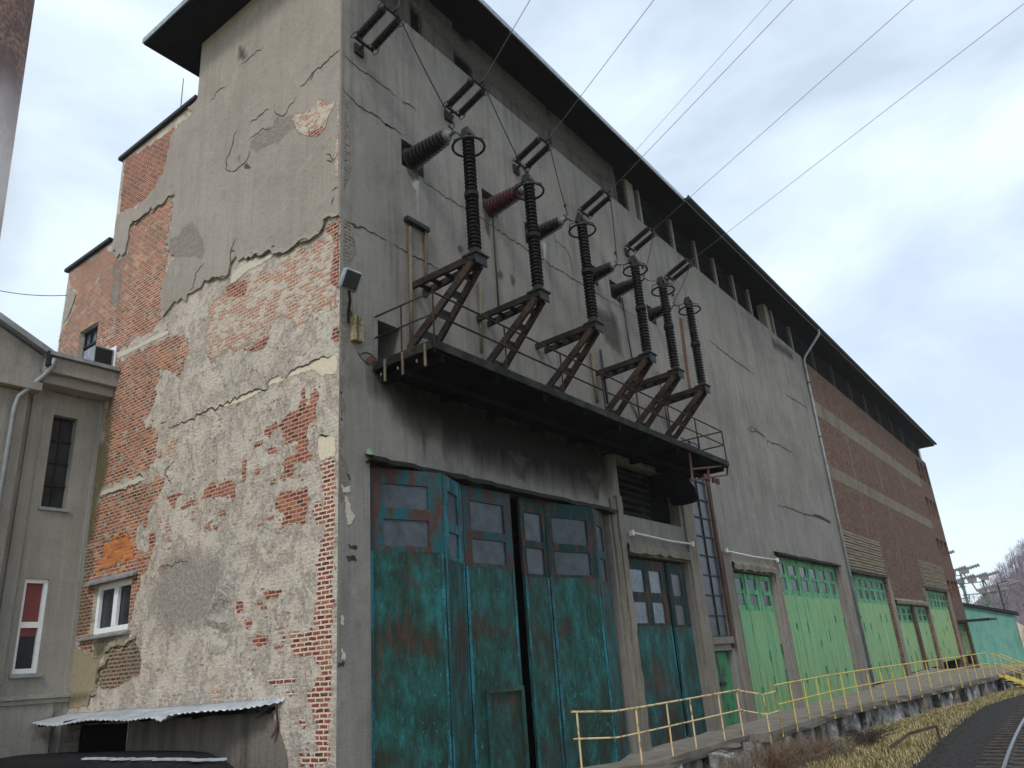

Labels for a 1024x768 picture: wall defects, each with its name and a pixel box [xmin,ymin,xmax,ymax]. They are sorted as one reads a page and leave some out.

crack [226,50,416,172]
spalling [292,97,351,189]
crack [189,241,235,291]
spalling [204,211,356,362]
spalling [58,124,260,709]
crack [162,356,331,428]
crack [747,426,793,454]
spalling [236,375,357,768]